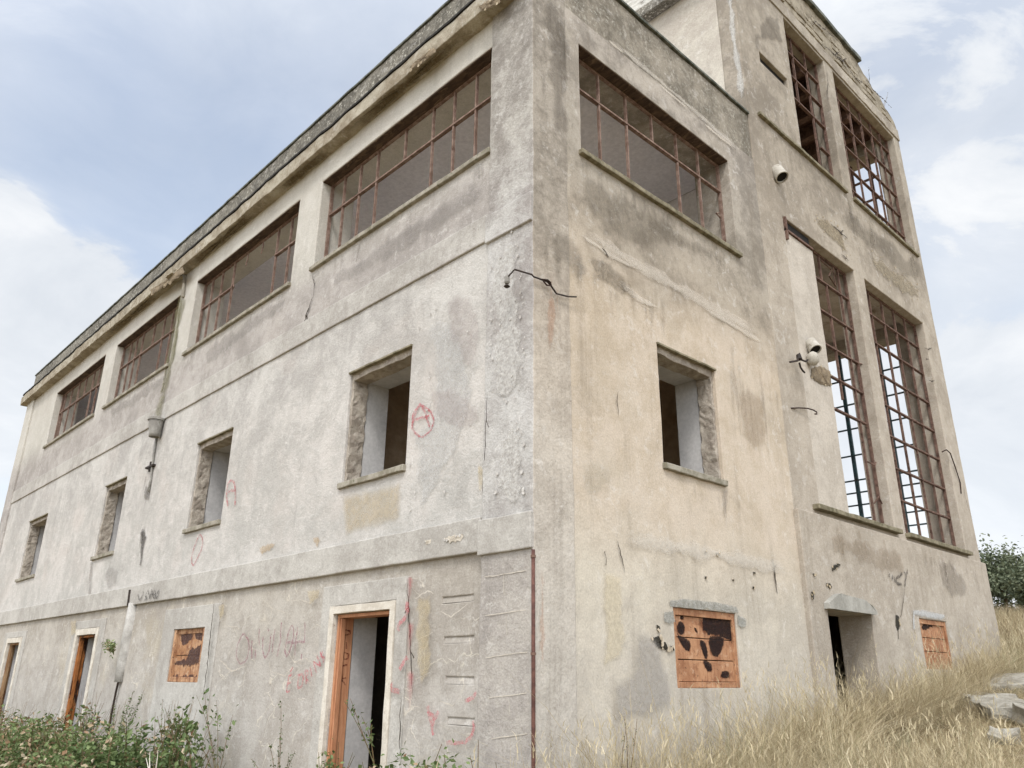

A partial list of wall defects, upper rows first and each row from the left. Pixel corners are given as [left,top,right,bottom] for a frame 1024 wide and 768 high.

crack [482,401,490,461]
spalling [651,625,675,652]